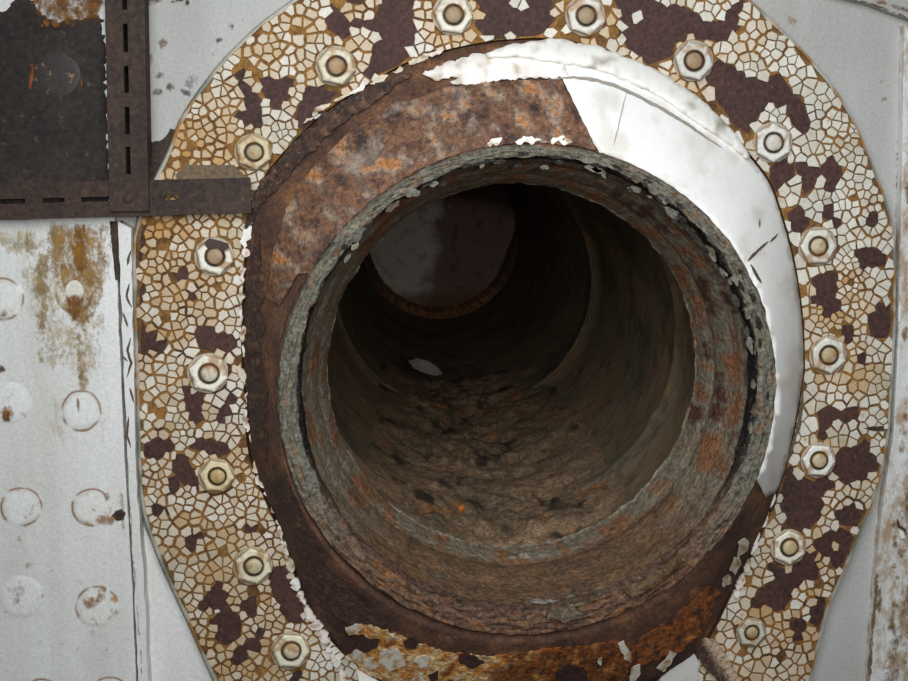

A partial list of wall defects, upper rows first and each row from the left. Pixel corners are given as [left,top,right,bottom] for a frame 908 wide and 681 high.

corrosion [31,0,103,27]
peeling [148,0,572,201]
crack [554,76,722,148]
peeling [376,181,446,213]
corrosion [242,72,596,459]
crack [748,219,778,283]
corrosion [0,225,108,409]
crack [787,391,804,461]
corrosion [270,472,720,681]
spalling [403,637,419,650]
spalling [459,654,485,669]
spalling [555,663,589,681]